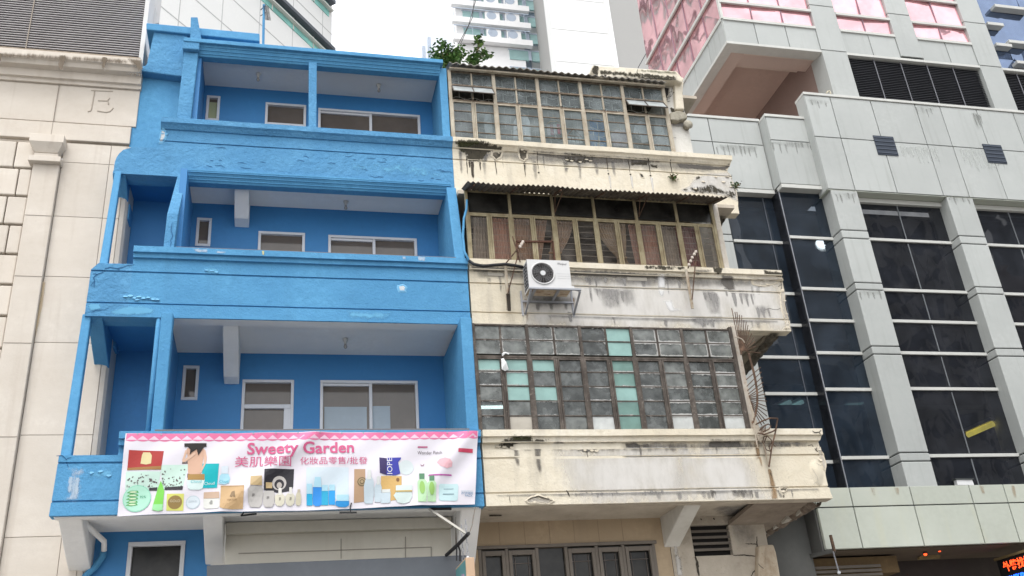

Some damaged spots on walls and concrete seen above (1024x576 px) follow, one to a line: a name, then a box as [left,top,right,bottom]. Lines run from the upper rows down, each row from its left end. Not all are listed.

damp [455,139,502,178]
damp [515,152,657,190]
damp [670,160,729,172]
peeling [683,173,736,199]
damp [570,265,770,327]
damp [496,436,562,470]
damp [626,443,692,454]
spalling [524,494,555,505]